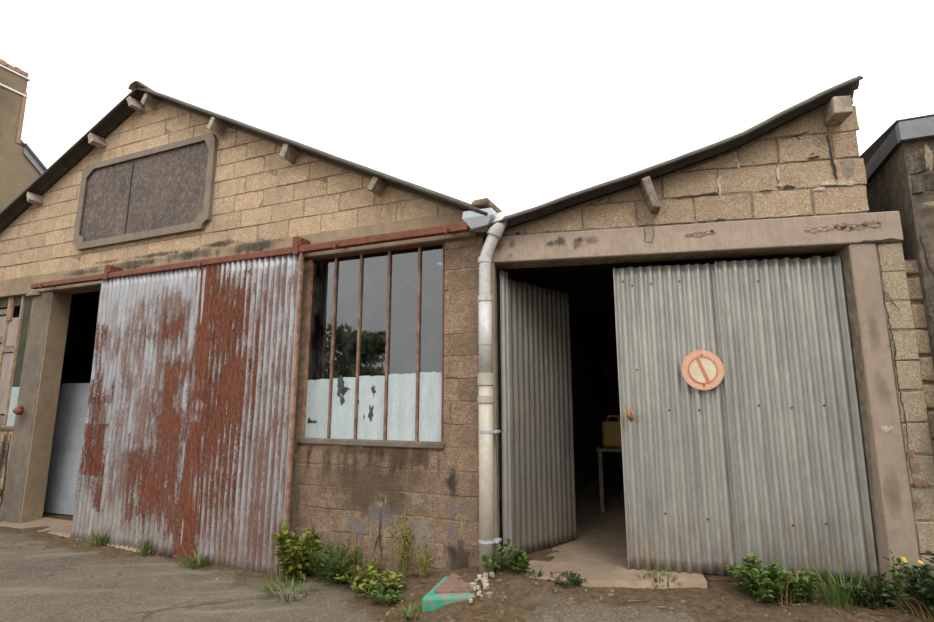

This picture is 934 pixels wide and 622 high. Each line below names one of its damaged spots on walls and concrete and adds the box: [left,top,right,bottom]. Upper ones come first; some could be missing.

spalling [805,220,881,234]
corrosion [76,259,298,569]
peeling [337,375,350,405]
peeling [358,386,376,422]
water stain [0,433,8,470]